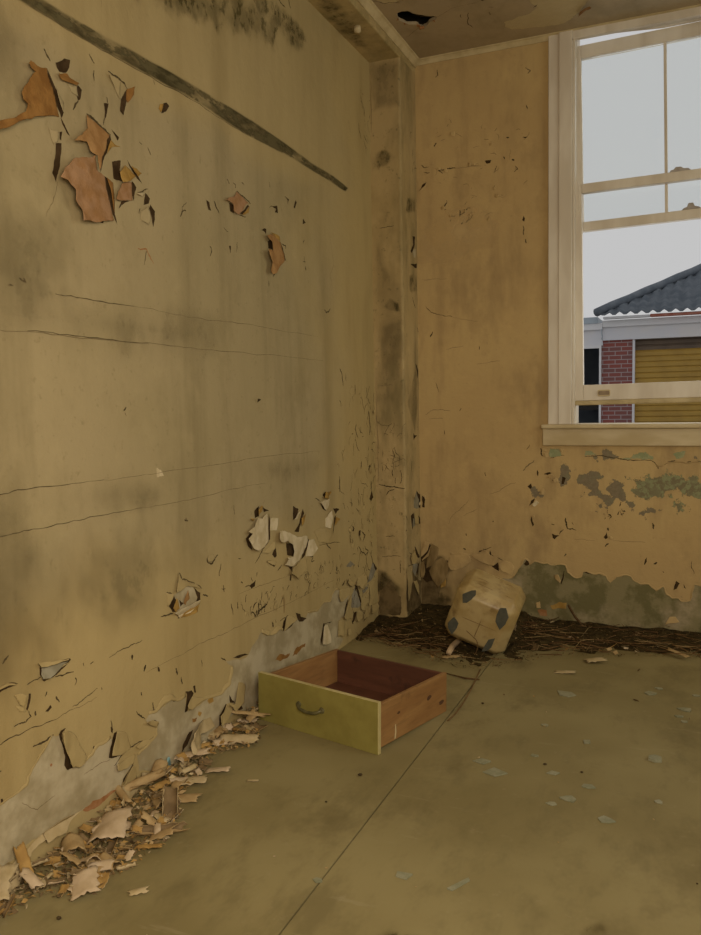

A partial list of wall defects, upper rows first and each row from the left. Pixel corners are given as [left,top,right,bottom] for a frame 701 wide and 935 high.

peeling [504,0,591,30]
leakage [22,0,348,191]
peeling [0,49,155,227]
peeling [227,191,250,217]
peeling [262,228,286,277]
peeling [246,491,340,581]
peeling [406,490,426,538]
peeling [406,541,449,612]
flaking render [502,554,701,635]
peeling [528,448,701,547]
peeling [584,643,639,663]
flaking render [0,547,379,900]